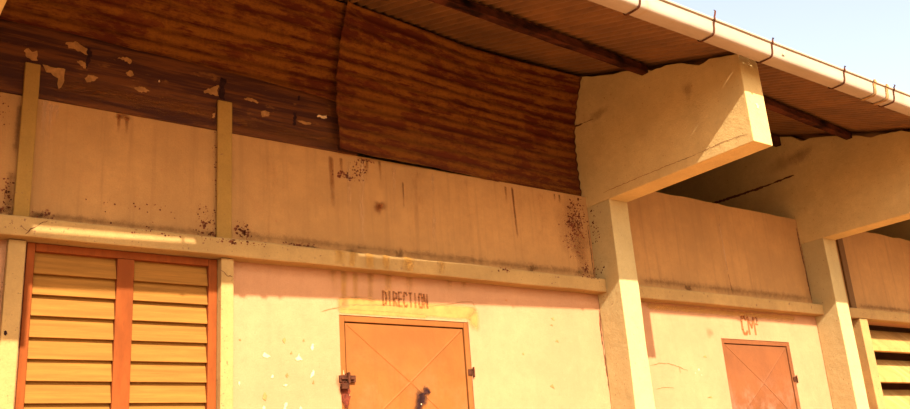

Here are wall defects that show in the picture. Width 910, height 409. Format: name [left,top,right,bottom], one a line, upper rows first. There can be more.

peeling [24,48,65,89]
peeling [65,41,98,82]
damp [332,158,374,182]
crack [607,134,746,191]
crack [712,175,794,203]
damp [193,206,266,247]
damp [558,198,605,279]